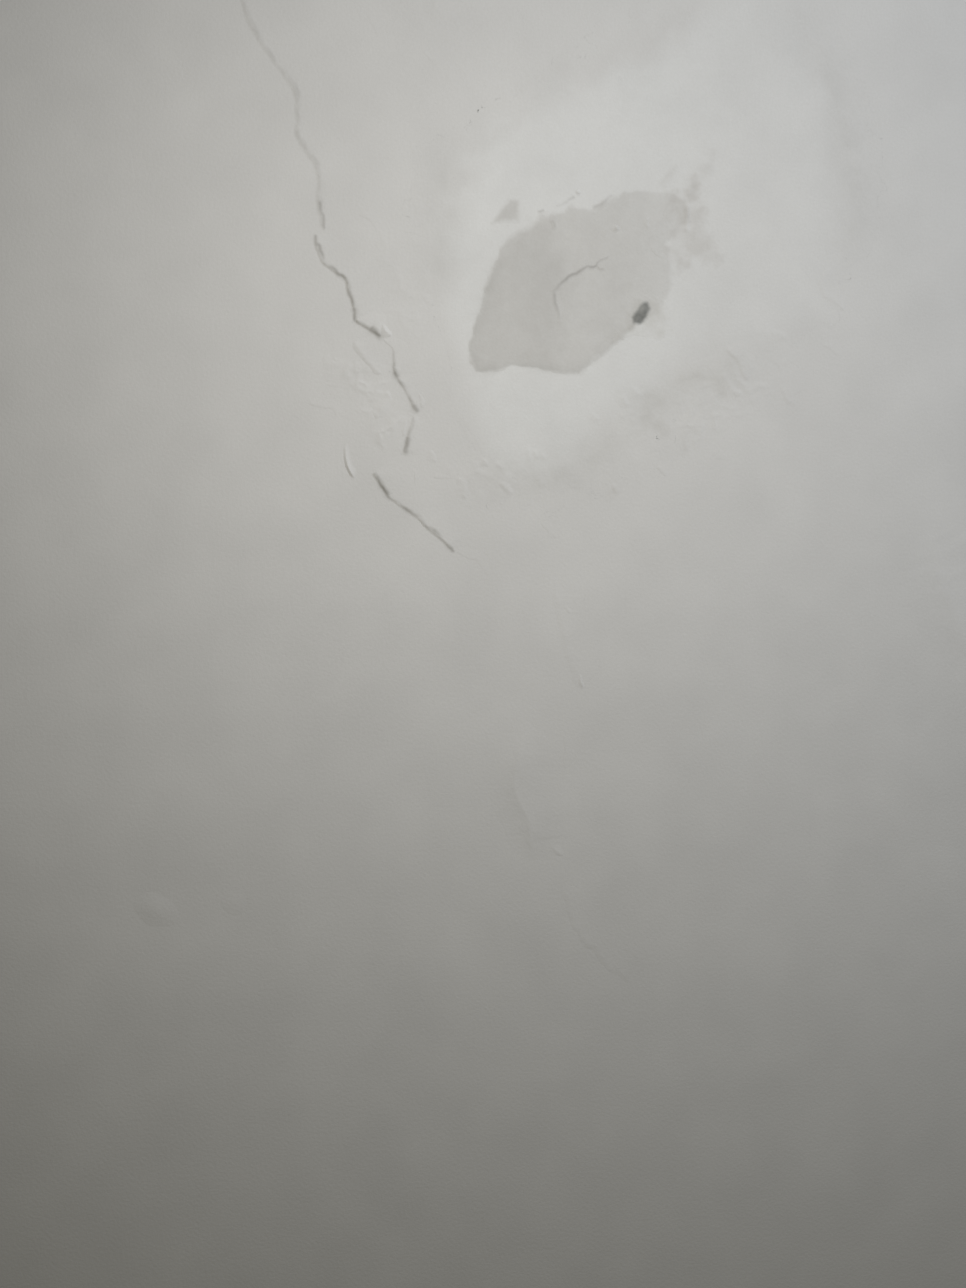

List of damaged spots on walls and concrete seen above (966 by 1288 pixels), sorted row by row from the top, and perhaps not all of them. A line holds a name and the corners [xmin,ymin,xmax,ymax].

spalling [468,146,726,374]